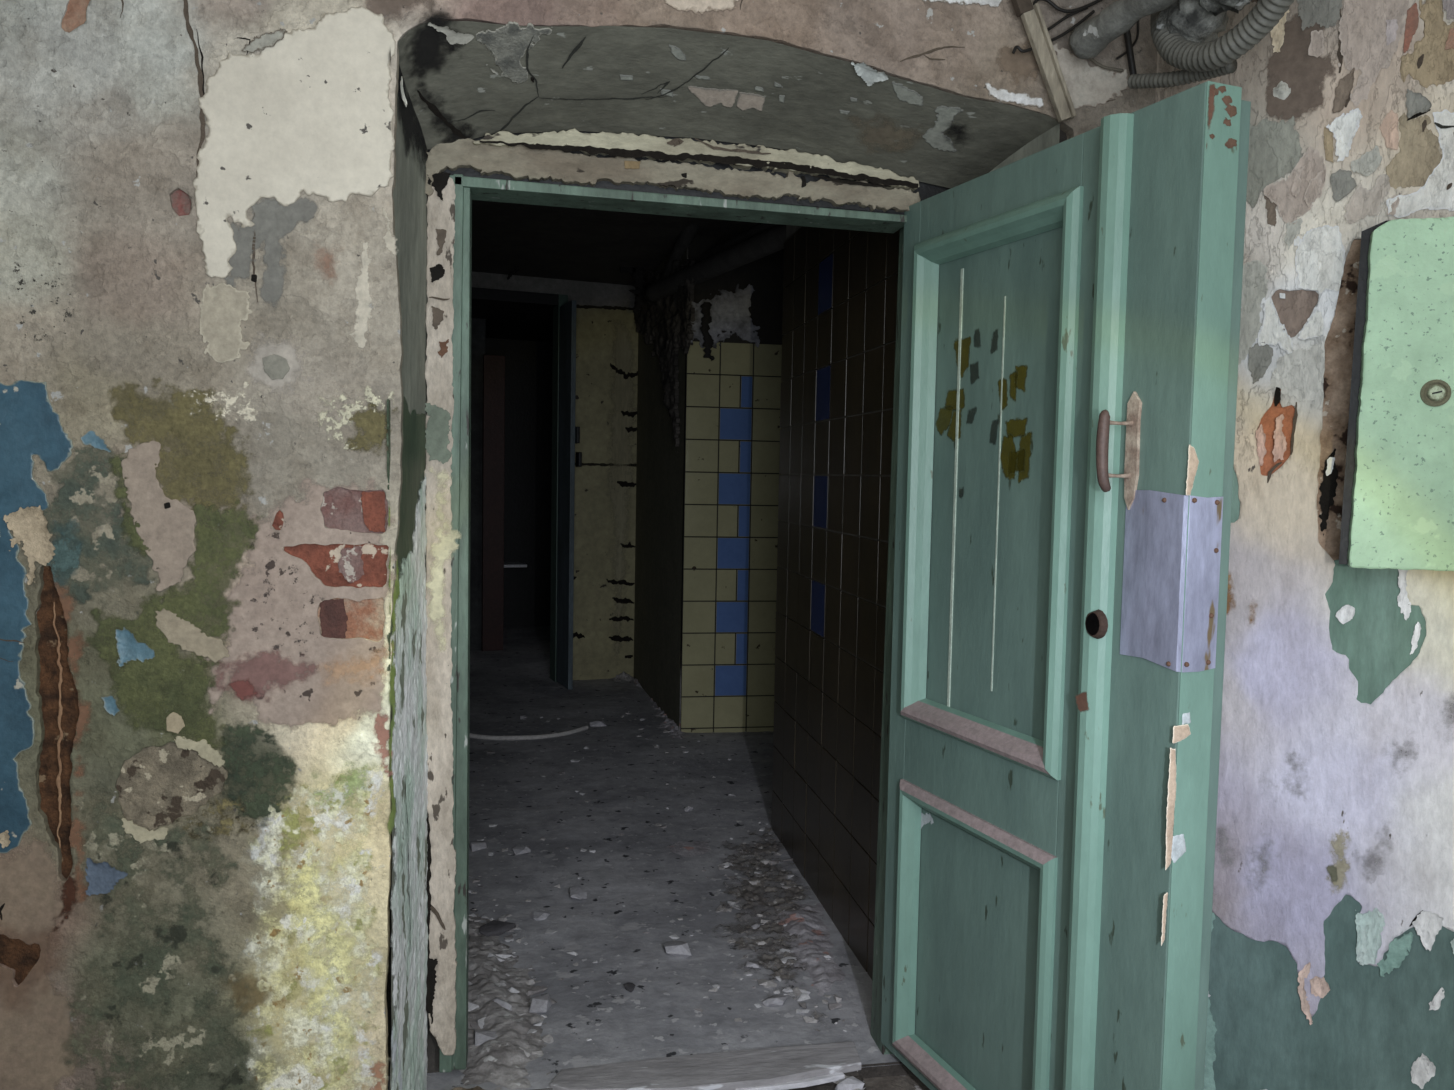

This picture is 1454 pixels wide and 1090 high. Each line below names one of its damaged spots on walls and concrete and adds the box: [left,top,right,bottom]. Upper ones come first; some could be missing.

crack [183,0,206,177]
peeling [170,6,407,363]
crack [417,35,918,188]
crack [900,46,965,62]
peeling [1199,0,1454,705]
peeling [0,380,196,1090]
spalling [116,712,228,844]
flaking render [115,609,317,701]
peeling [272,396,460,1090]
spalling [230,976,268,1011]
peeling [1204,894,1454,1090]